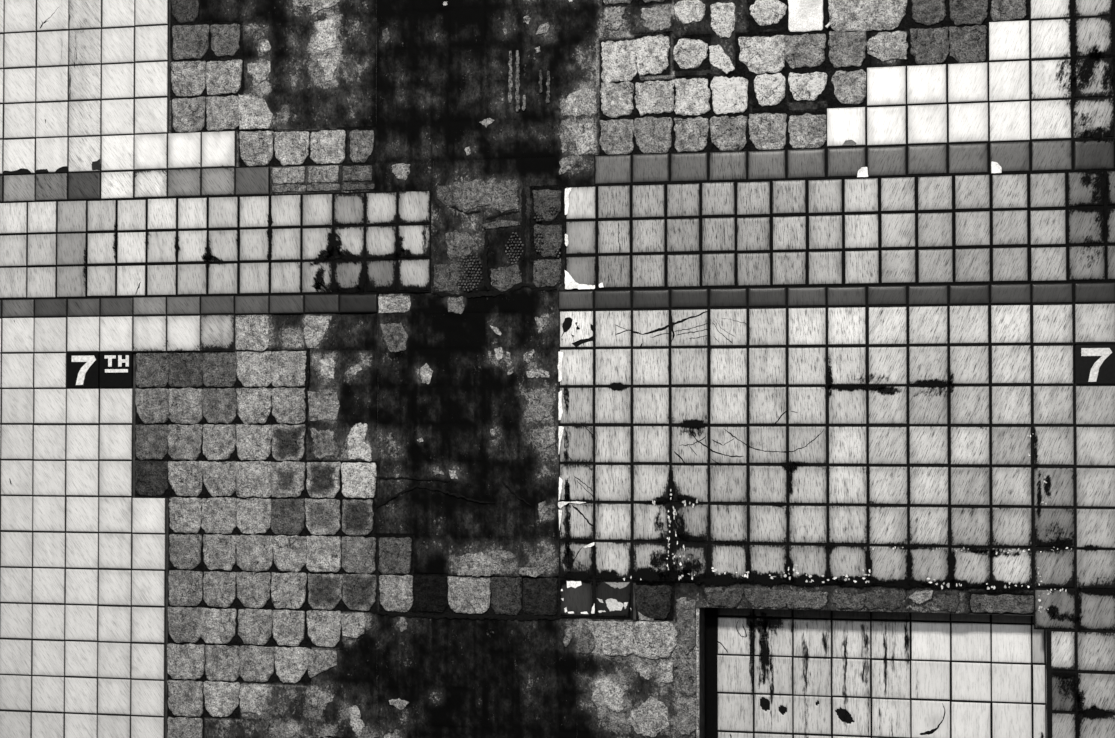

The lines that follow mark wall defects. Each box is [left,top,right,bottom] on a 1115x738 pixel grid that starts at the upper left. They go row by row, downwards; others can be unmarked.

spalling [169,0,411,194]
spalling [480,0,555,140]
spalling [527,0,1030,179]
water stain [1054,0,1115,139]
water stain [1083,208,1110,267]
spalling [135,137,1066,738]
water stain [200,0,1034,738]
crack [616,311,746,348]
water stain [1046,582,1115,632]
water stain [1050,672,1096,738]